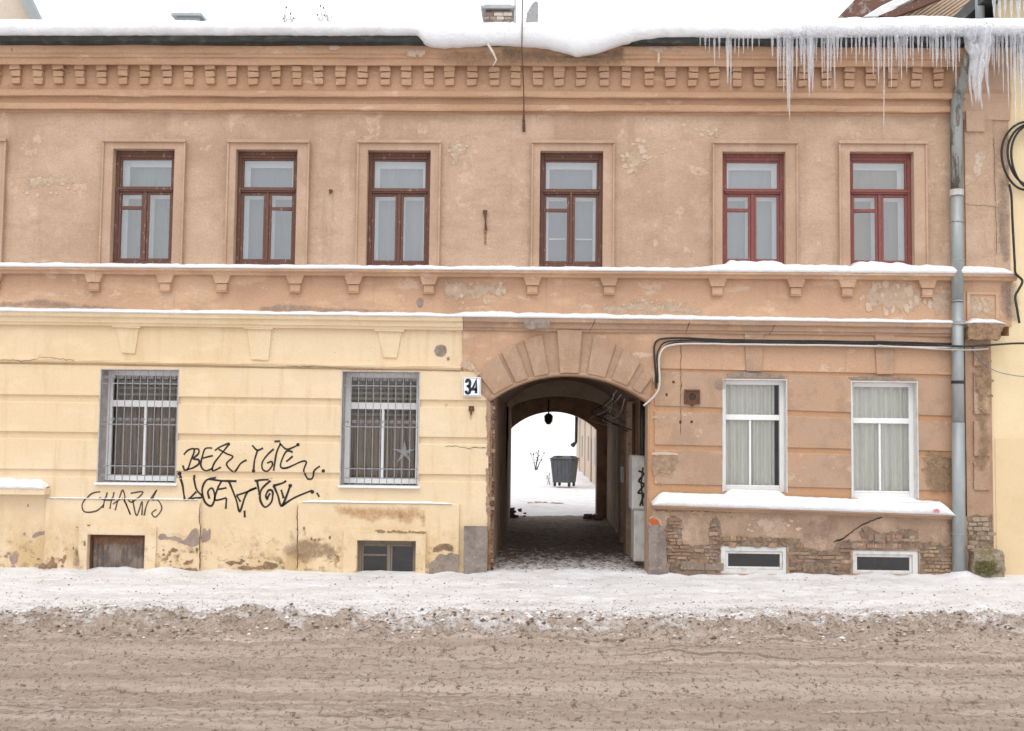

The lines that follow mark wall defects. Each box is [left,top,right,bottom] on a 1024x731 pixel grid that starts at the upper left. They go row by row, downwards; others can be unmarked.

flaking render [439,279,507,305]
flaking render [859,280,951,317]
spalling [158,528,211,571]
water stain [288,541,332,558]
flaking render [648,509,952,576]
crack [834,517,882,542]